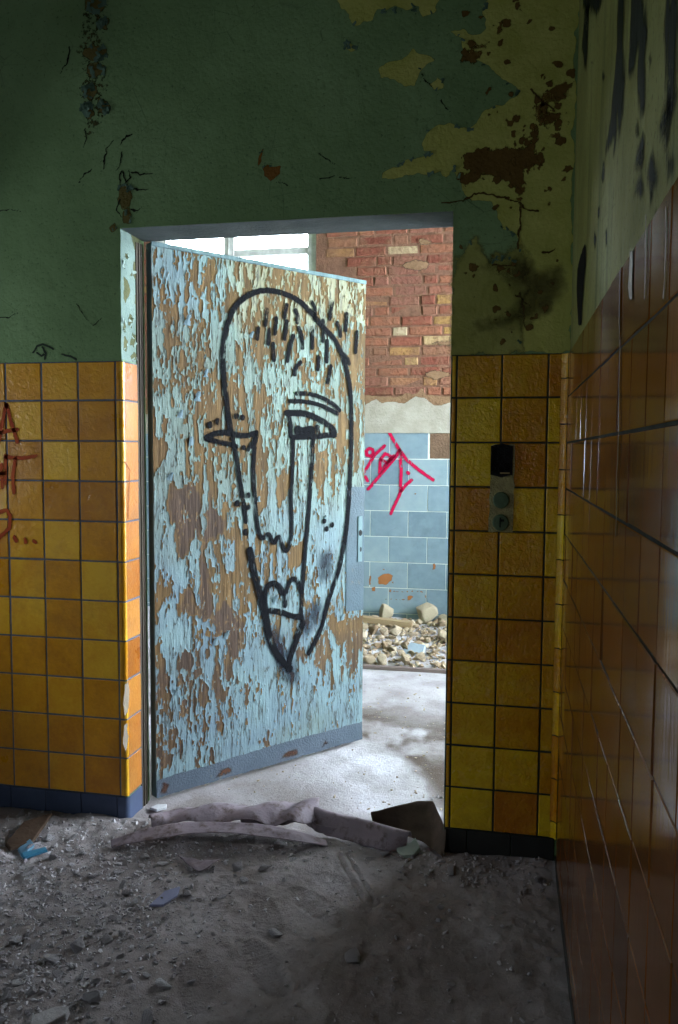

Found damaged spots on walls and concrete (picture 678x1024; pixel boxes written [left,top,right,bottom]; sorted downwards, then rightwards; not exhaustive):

water stain [456,0,602,221]
crack [78,128,153,217]
crack [441,192,555,266]
water stain [492,255,559,345]
peeling [109,0,586,785]